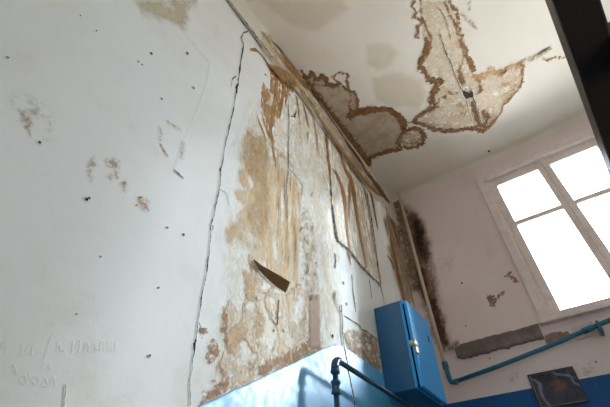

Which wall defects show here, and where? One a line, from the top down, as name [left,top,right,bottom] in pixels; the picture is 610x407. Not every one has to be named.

crack [188,0,280,406]
peeling [200,95,334,405]
crack [329,165,385,406]
peeling [345,330,381,370]
damp [250,0,526,351]
crack [438,8,482,124]
spalling [459,86,475,101]